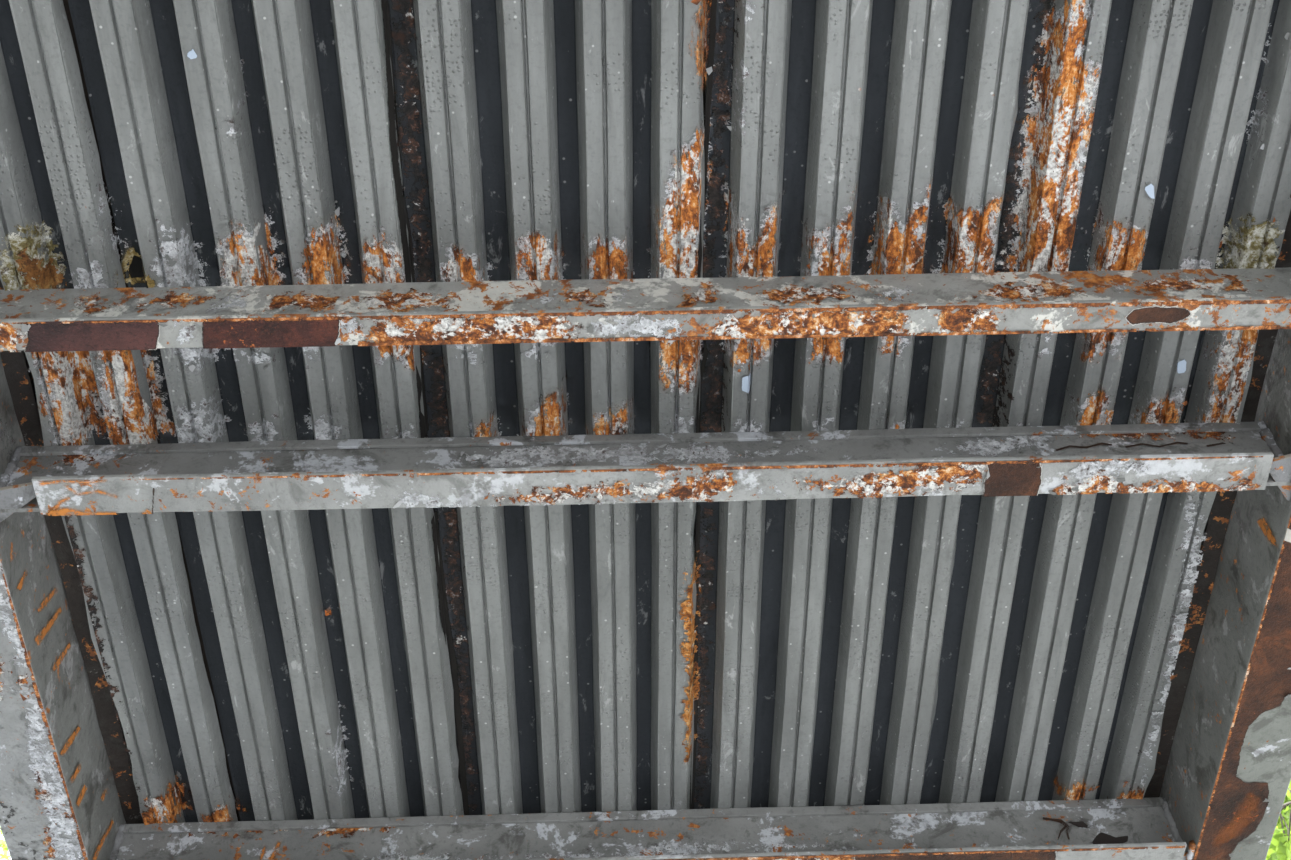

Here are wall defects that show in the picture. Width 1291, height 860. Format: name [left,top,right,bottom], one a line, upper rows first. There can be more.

rust [0,0,1291,516]
peeling [0,561,29,668]
peeling [0,686,85,860]
rust [0,567,113,860]
rust [141,775,289,860]
rust [312,827,400,838]
rust [664,517,1291,860]
peeling [1194,516,1291,860]